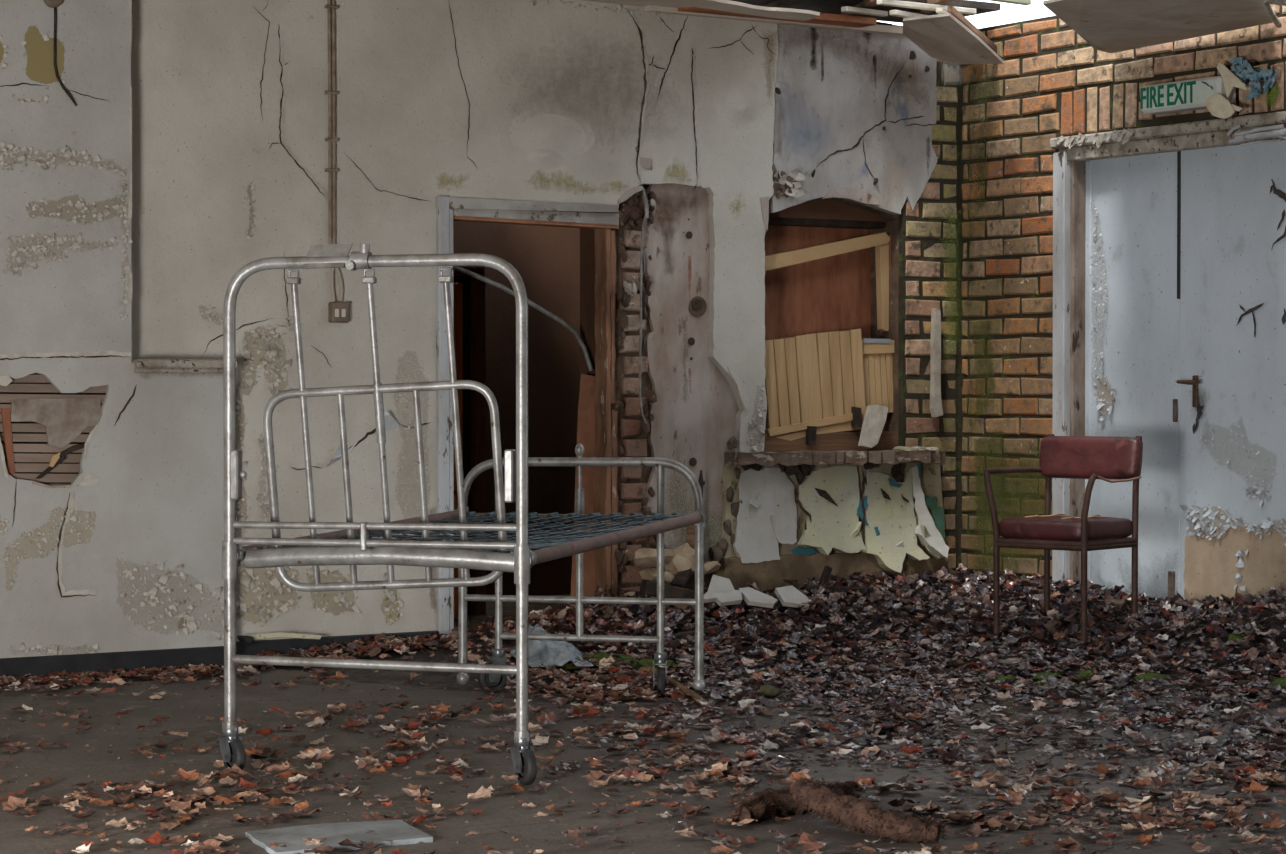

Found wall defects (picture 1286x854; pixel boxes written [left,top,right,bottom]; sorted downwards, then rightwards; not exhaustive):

peeling [0,26,65,105]
crack [0,83,104,100]
peeling [0,87,133,320]
crack [255,3,328,200]
crack [348,157,428,201]
crack [449,5,478,169]
crack [628,7,775,189]
crack [816,59,934,179]
spalling [0,374,107,488]
spalling [614,157,767,597]
peeling [1179,423,1286,610]
peeling [115,558,360,640]